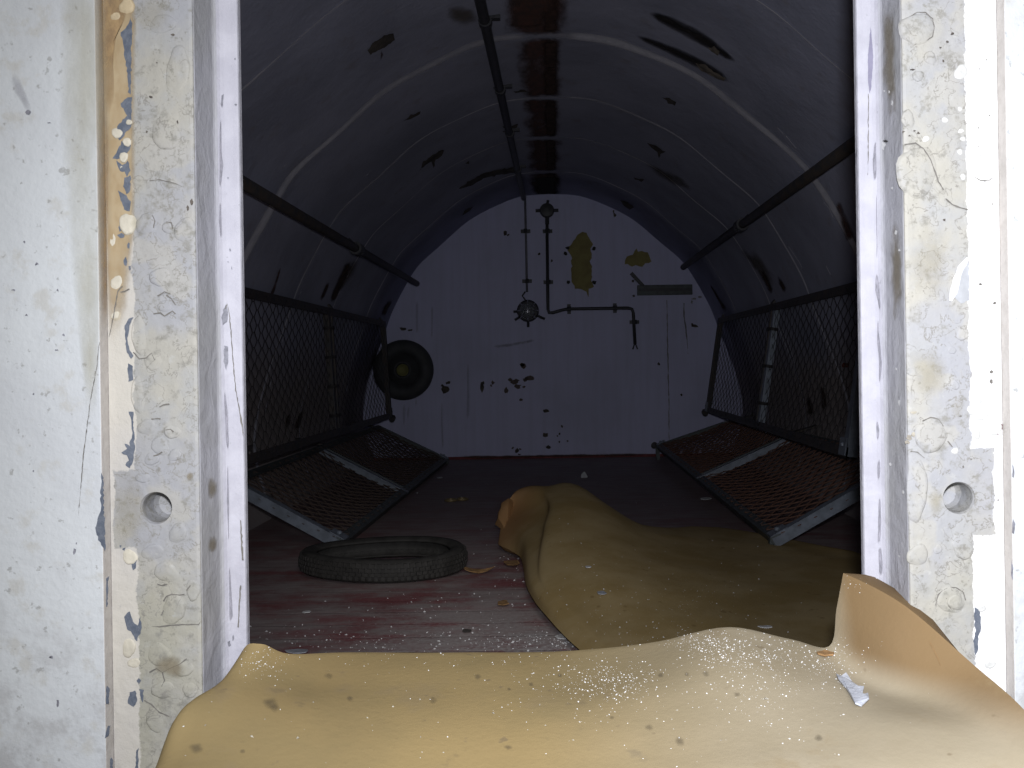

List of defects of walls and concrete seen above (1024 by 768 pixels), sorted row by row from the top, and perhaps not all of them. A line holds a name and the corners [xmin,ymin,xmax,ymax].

spalling [368,33,395,57]
spalling [641,14,731,81]
peeling [113,18,132,211]
crack [904,142,968,210]
spalling [949,256,989,303]
crack [78,286,130,515]
peeling [124,317,133,382]
peeling [480,363,534,401]
peeling [121,412,135,468]
peeling [95,473,106,551]
peeling [124,611,142,641]
peeling [128,678,144,707]